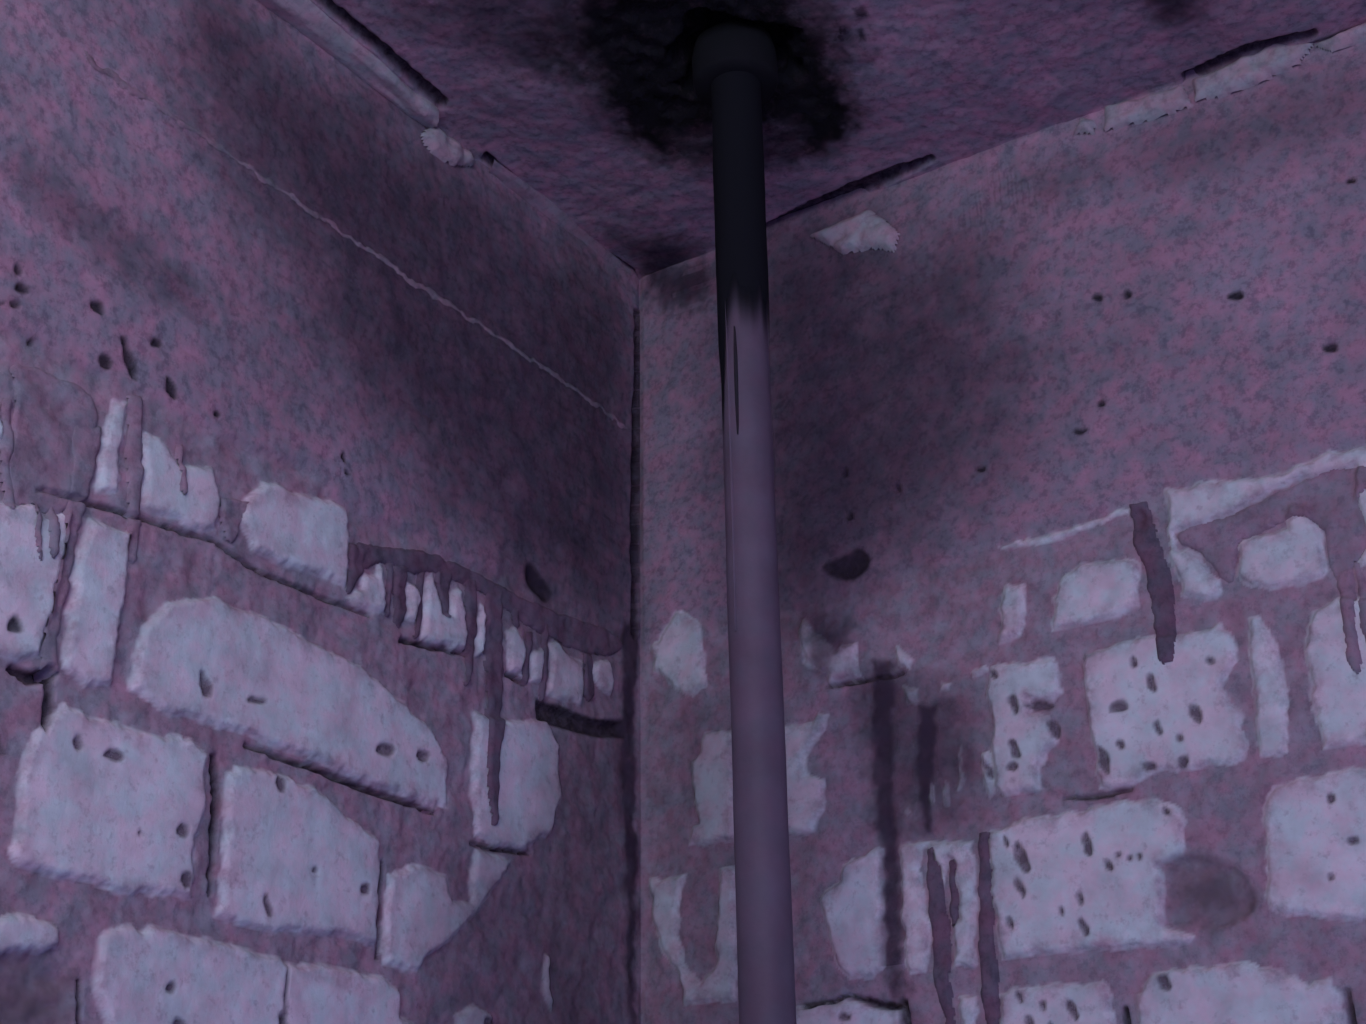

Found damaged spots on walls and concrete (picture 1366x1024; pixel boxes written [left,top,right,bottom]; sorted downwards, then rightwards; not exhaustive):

peeling [1074,22,1366,136]
peeling [420,126,474,168]
peeling [810,210,901,255]
spalling [7,618,20,632]
crack [398,641,457,655]
water stain [1129,501,1177,665]
water stain [1337,563,1366,674]
crack [206,756,215,874]
crack [247,749,430,815]
water stain [345,542,638,1017]
water stain [926,847,959,1024]
water stain [977,832,1001,1024]